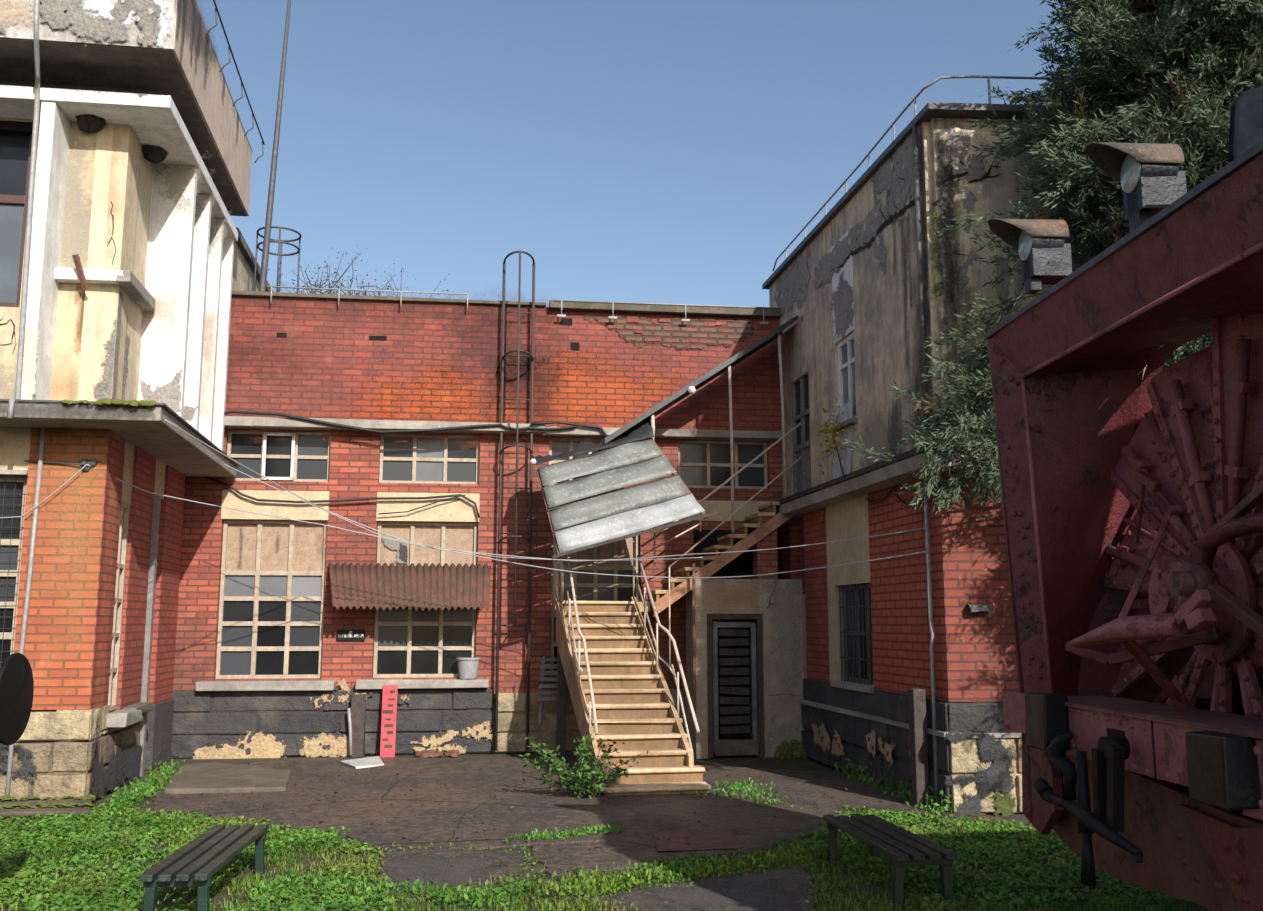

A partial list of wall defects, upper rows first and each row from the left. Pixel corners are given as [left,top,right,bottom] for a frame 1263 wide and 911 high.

spalling [0,0,172,47]
spalling [944,118,1021,294]
crack [107,201,116,264]
spalling [774,133,915,340]
damp [874,125,973,455]
spalling [561,314,754,350]
peeling [193,731,349,759]
peeling [410,721,493,754]
peeling [811,723,845,758]
peeling [866,729,895,769]